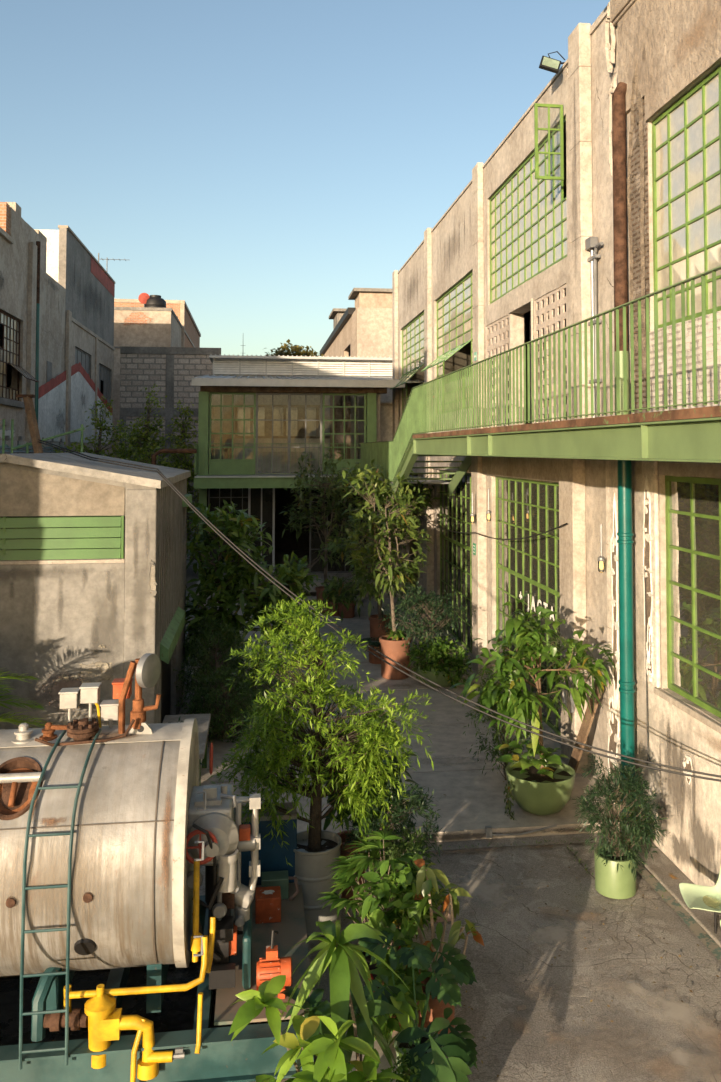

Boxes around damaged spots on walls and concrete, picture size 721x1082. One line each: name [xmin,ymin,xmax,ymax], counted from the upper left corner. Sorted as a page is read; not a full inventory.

peeling [56,662,114,701]
damp [658,724,716,882]
crack [426,841,715,986]